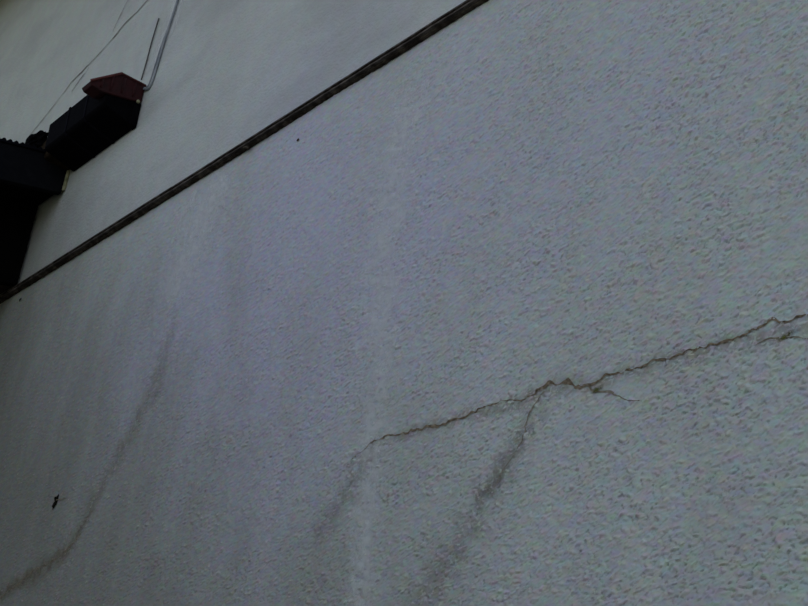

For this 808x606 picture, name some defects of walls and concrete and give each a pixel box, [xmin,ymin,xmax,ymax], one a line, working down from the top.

crack [344,314,808,488]